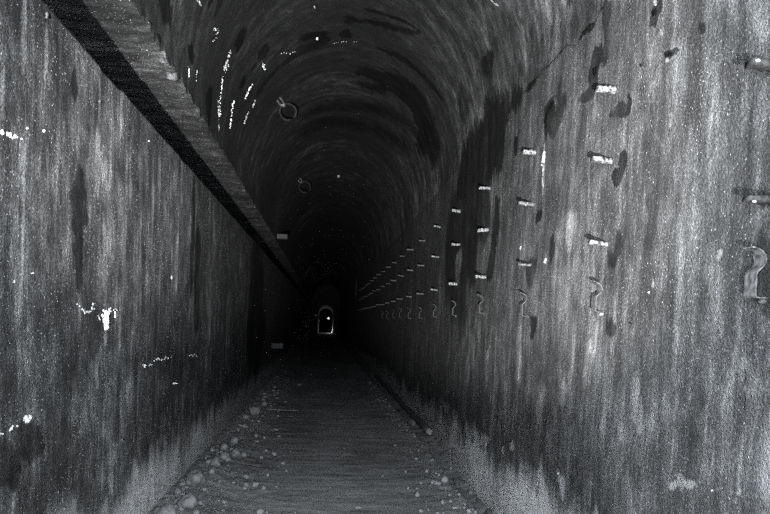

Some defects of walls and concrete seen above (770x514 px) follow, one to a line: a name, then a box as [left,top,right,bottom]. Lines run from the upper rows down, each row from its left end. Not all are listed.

water stain [60,125,101,293]
water stain [76,153,132,416]
water stain [0,397,48,490]